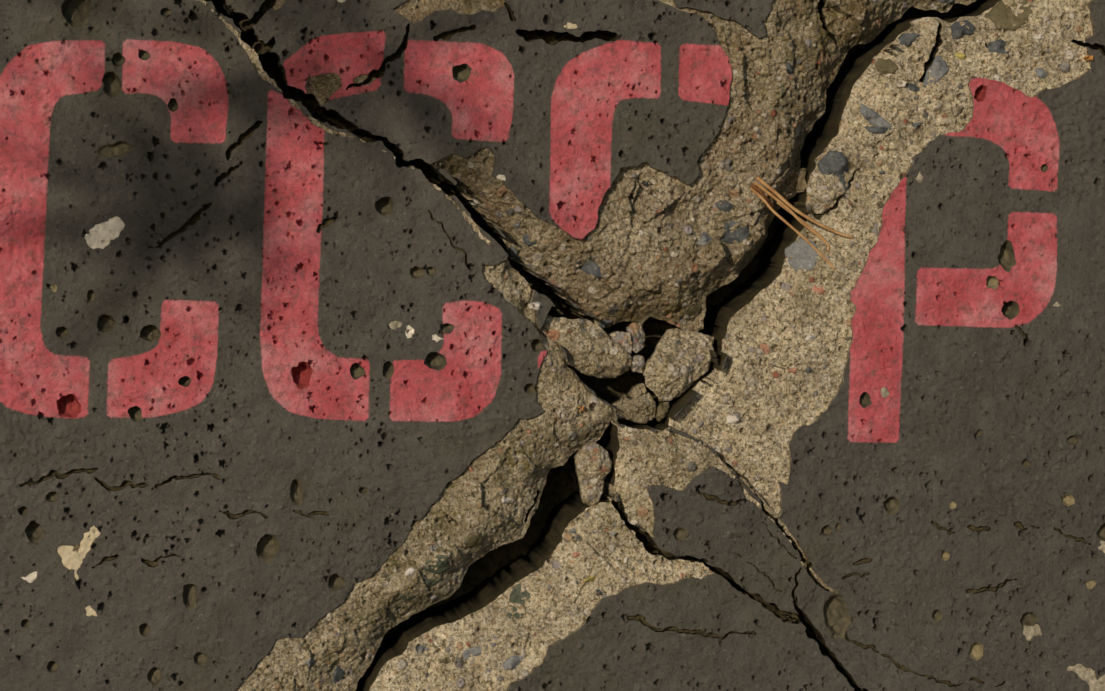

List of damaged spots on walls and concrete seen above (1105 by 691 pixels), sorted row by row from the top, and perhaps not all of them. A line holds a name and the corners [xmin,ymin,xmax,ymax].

crack [1071,39,1105,56]
crack [148,121,263,248]
crack [198,0,1005,691]
spalling [235,0,1094,691]
crack [1015,325,1029,343]
crack [19,468,221,492]
crack [931,521,1091,545]
crack [91,553,180,569]
crack [966,578,1017,594]